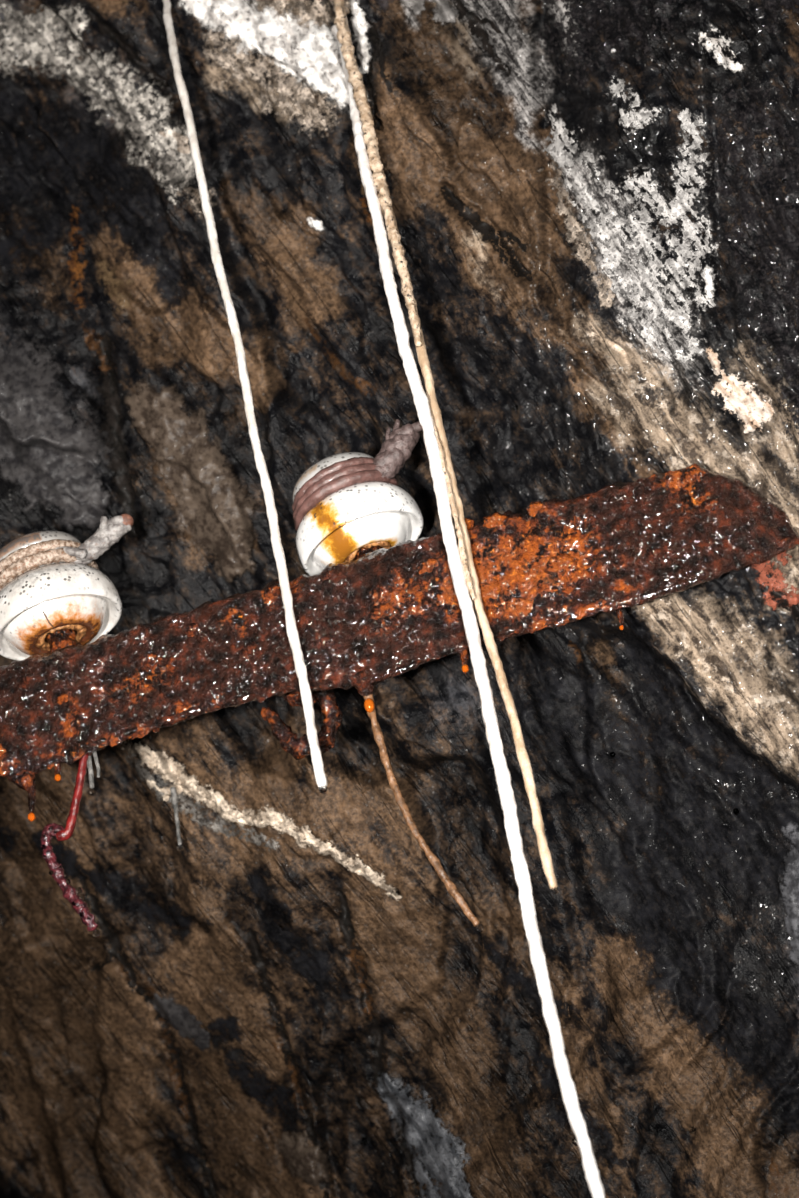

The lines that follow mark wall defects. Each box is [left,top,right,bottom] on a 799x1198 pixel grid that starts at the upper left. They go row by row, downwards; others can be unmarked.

damp [182,0,371,137]
damp [0,0,217,317]
damp [538,0,799,440]
rust [454,512,508,532]
rust [527,501,547,517]
rust [263,583,281,599]
rust [417,557,438,574]
rust [479,581,502,604]
rust [543,570,734,629]
rust [749,536,799,610]
rust [360,597,533,682]
rust [152,683,296,733]